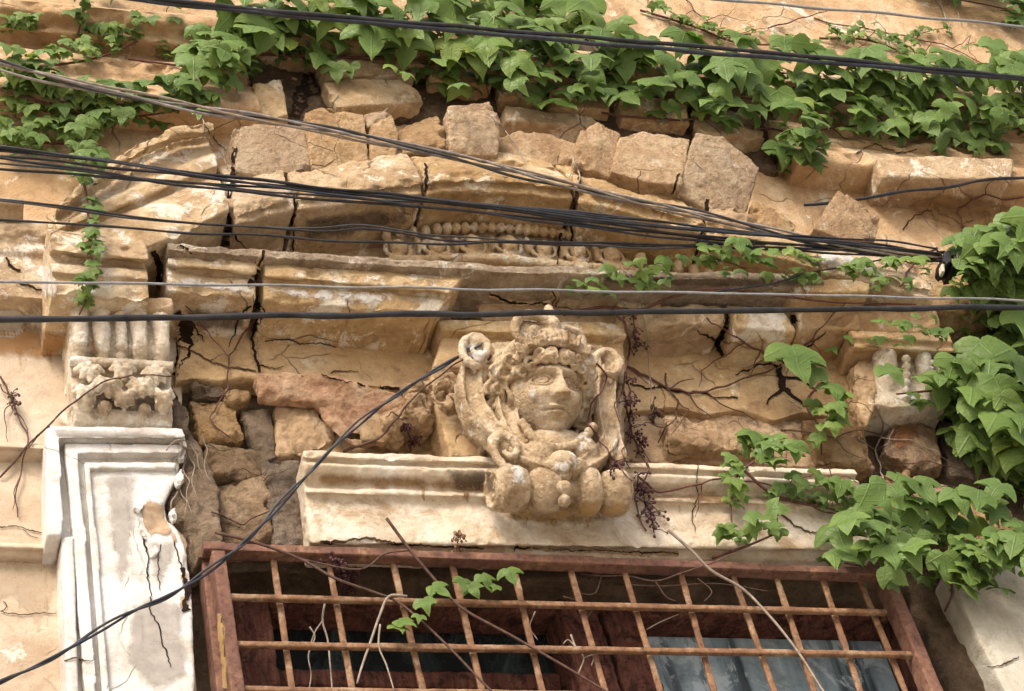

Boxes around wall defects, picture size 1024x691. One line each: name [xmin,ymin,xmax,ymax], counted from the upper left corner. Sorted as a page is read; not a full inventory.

crack [421,163,430,192]
crack [557,172,583,265]
crack [903,191,973,232]
crack [172,126,400,390]
crack [630,314,817,408]
crack [790,315,826,348]
peeling [173,449,186,490]
spalling [133,500,177,559]
crack [143,535,192,667]
corrosion [217,614,227,688]